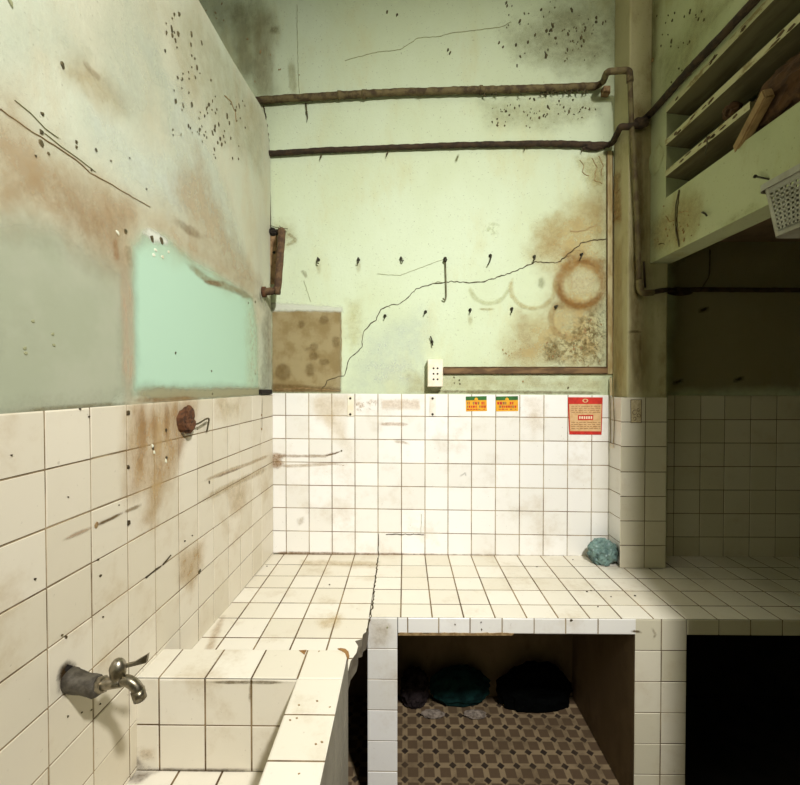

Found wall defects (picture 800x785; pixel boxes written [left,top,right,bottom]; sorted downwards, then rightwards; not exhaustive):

crack [345,22,510,61]
mould [515,1,606,67]
crack [0,100,150,207]
leakage [135,31,251,278]
mould [491,97,596,128]
peeling [145,229,170,259]
crack [321,224,606,390]
leakage [502,214,605,366]
rust [126,404,181,501]
crack [366,514,424,632]